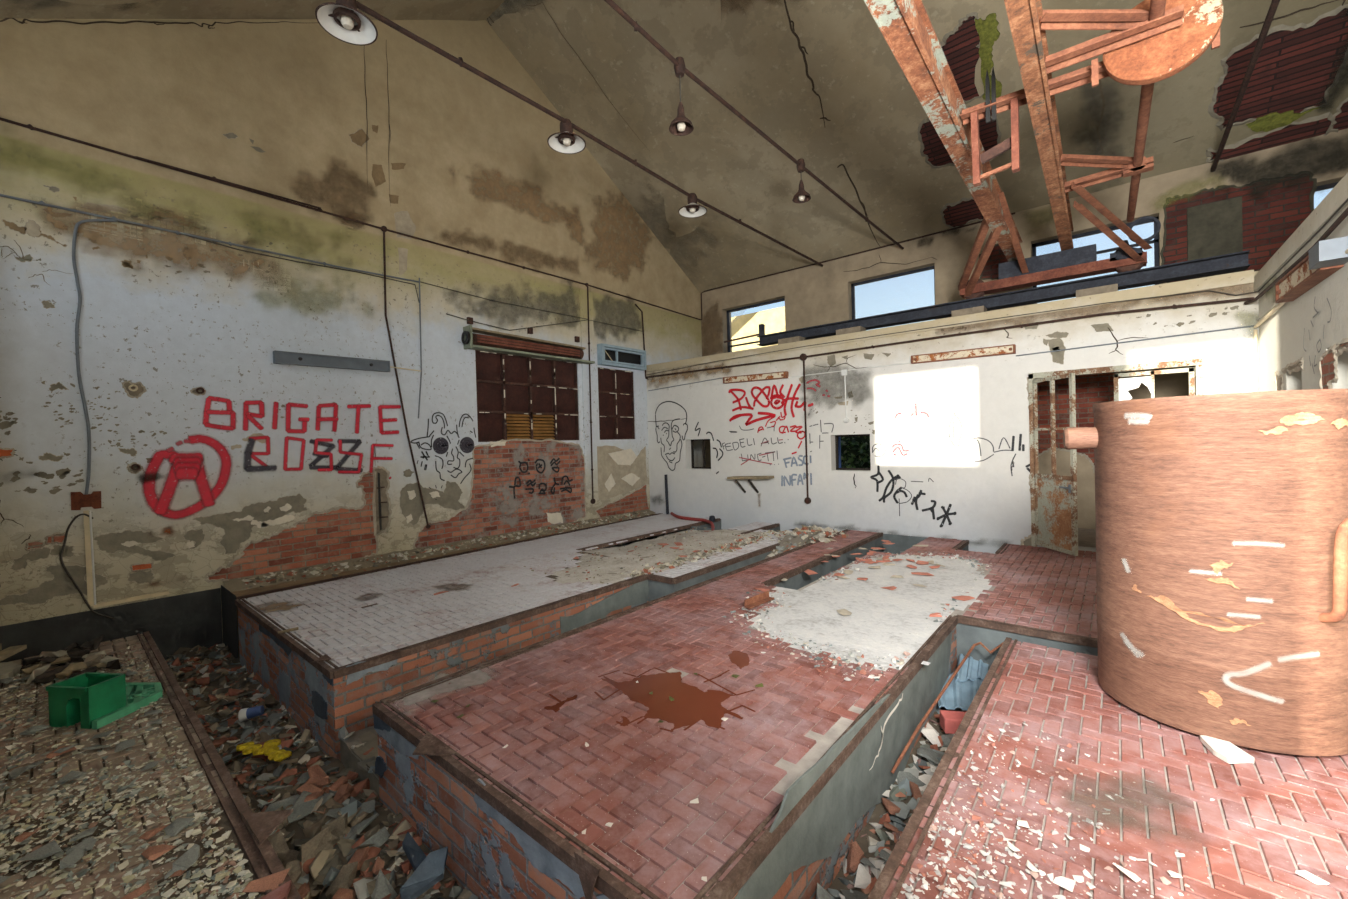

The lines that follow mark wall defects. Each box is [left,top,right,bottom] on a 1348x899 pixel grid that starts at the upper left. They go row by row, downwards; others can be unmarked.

crack [0,18,299,29]
crack [364,52,391,205]
crack [784,0,831,126]
spalling [917,117,955,169]
spalling [939,12,1003,155]
spalling [1205,4,1348,163]
mould [1215,138,1348,198]
damp [44,206,277,277]
damp [472,171,650,279]
damp [474,288,640,338]
spalling [1274,338,1348,391]
spalling [94,438,650,585]